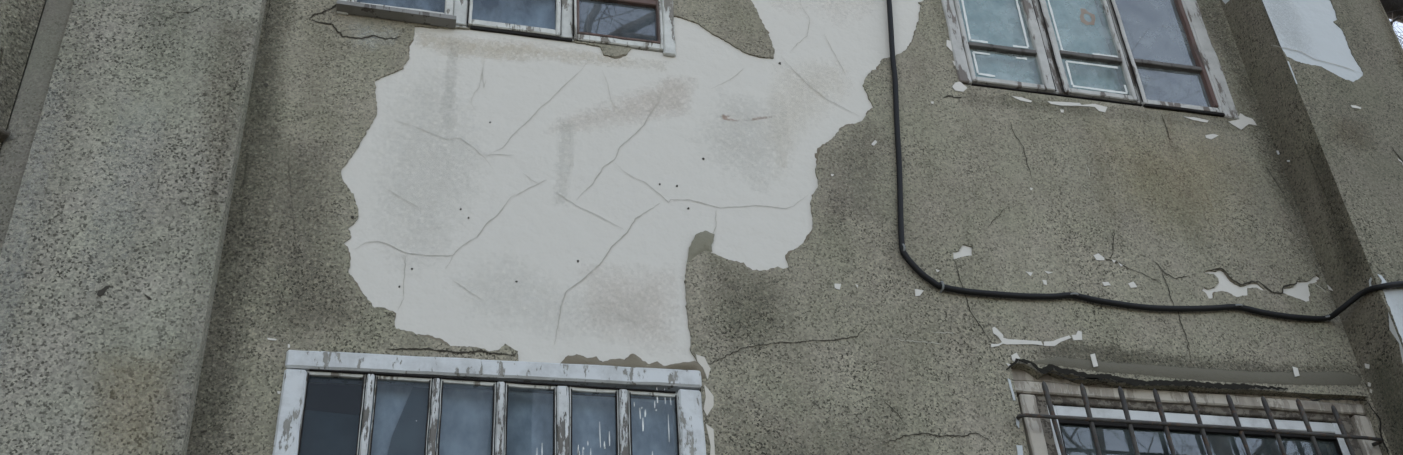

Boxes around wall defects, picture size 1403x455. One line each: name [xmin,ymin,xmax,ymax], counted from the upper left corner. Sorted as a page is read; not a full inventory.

peeling [1261,0,1363,84]
spalling [1011,96,1107,113]
spalling [1185,117,1218,140]
peeling [1229,113,1257,130]
crack [360,65,805,345]
peeling [341,0,923,455]
peeling [1202,270,1263,298]
peeling [1283,276,1333,302]
peeling [1369,274,1403,362]
crack [391,347,510,355]
peeling [991,327,1098,400]